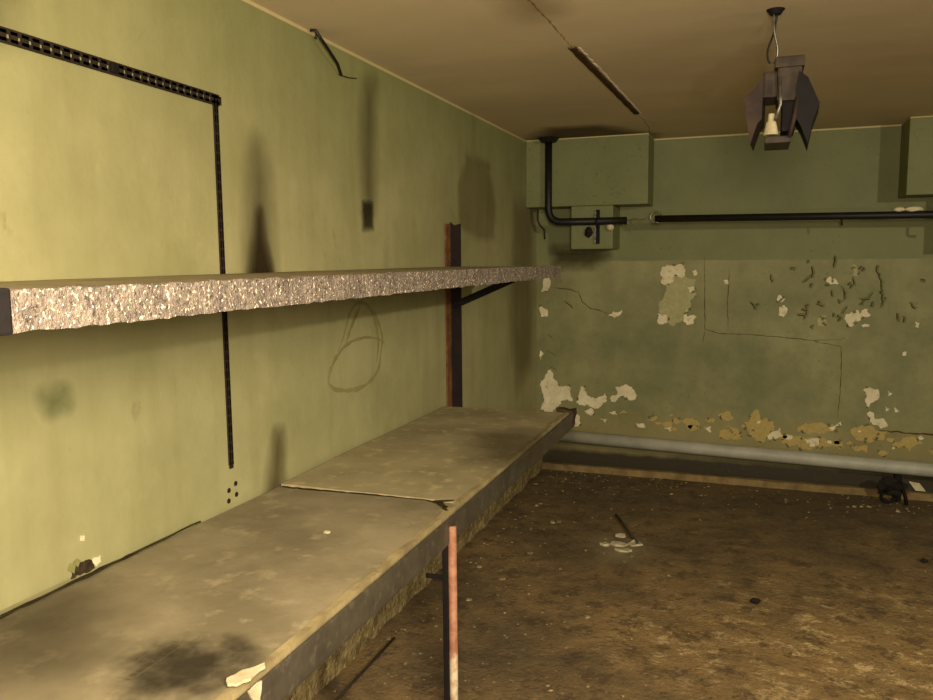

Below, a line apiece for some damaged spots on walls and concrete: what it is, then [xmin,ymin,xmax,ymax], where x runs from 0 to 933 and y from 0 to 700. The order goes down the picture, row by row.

peeling [657,262,698,326]
peeling [845,309,871,327]
peeling [540,369,637,427]
peeling [635,387,933,457]